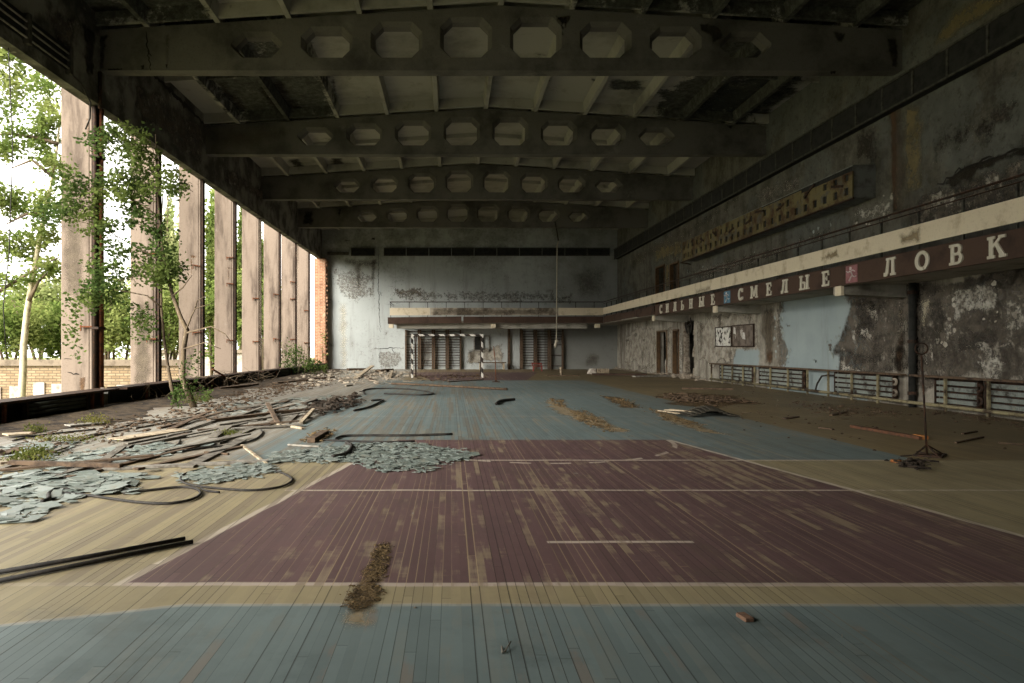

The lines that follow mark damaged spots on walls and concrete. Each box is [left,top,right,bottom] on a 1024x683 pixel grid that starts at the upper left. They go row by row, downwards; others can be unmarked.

water stain [904,102,1024,226]
flaking render [625,321,694,379]
peeling [773,303,791,366]